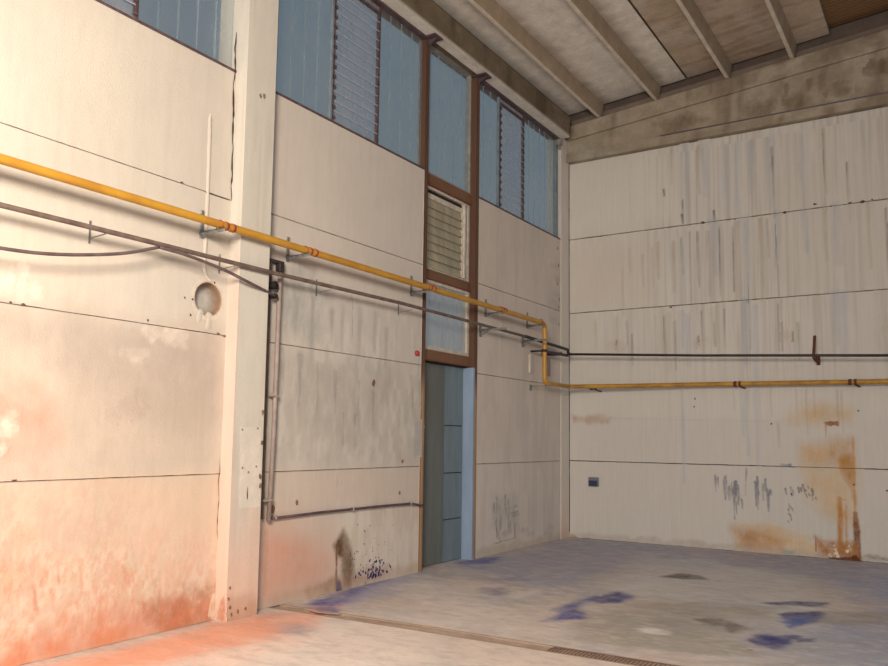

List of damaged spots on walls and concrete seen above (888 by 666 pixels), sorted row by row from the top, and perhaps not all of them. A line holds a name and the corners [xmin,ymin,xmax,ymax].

corrosion [726,396,867,561]
water stain [299,526,436,615]
water stain [53,614,324,666]